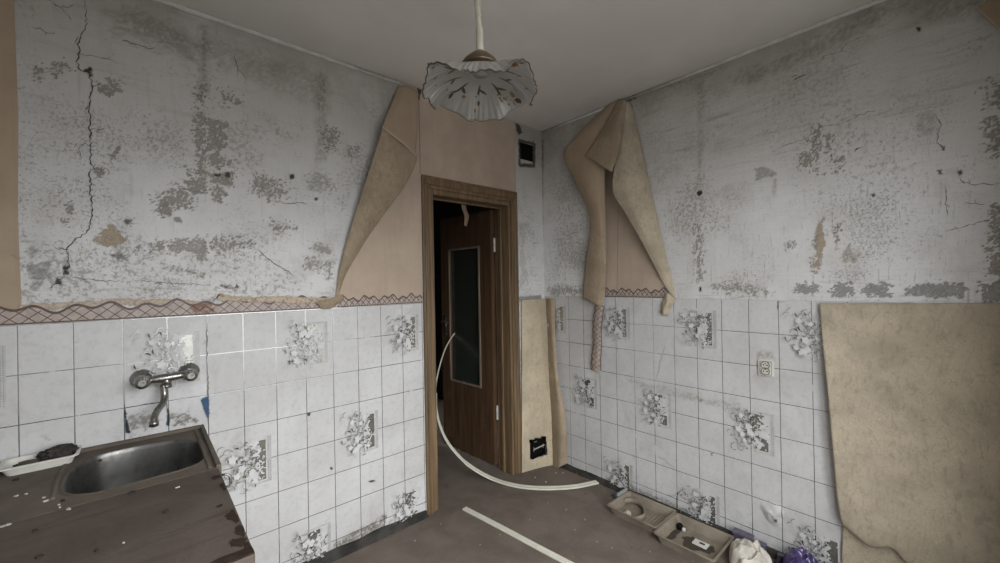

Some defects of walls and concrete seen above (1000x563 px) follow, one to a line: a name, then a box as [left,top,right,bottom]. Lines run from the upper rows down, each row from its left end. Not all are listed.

crack [30,0,200,290]
peeling [150,85,244,222]
peeling [303,86,418,296]
peeling [548,99,675,308]
peeling [793,203,1000,303]